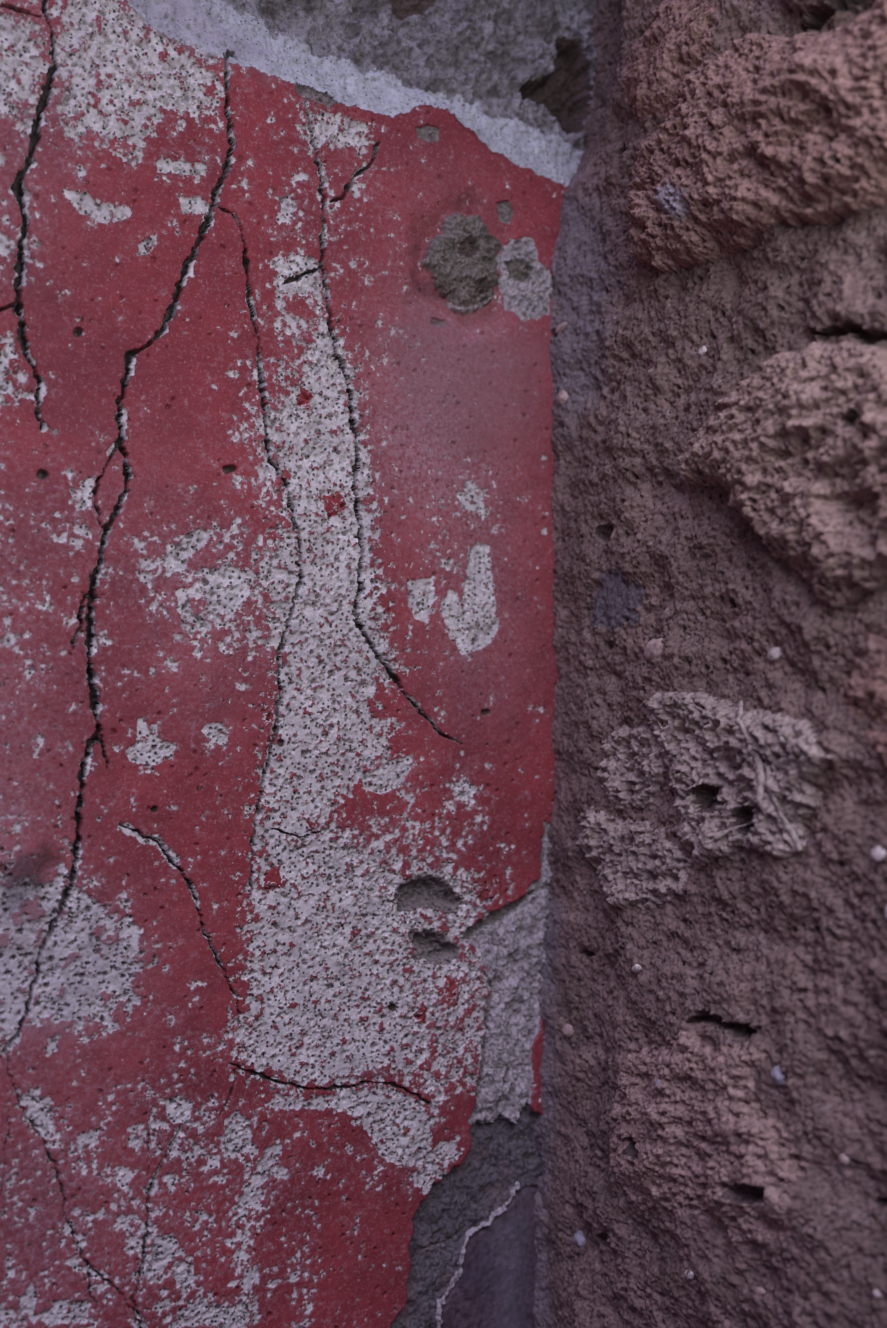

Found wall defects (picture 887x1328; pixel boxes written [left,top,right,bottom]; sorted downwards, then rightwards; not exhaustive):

spalling [0,0,597,187]
peeling [61,189,131,223]
peeling [178,195,209,215]
flaking render [420,201,553,328]
peeling [0,329,35,405]
peeling [81,477,94,507]
crack [0,0,461,1328]
peeling [113,716,173,774]
peeling [175,253,553,1328]
peeling [118,822,179,868]
peeling [0,791,158,1056]
peeling [18,1283,90,1326]